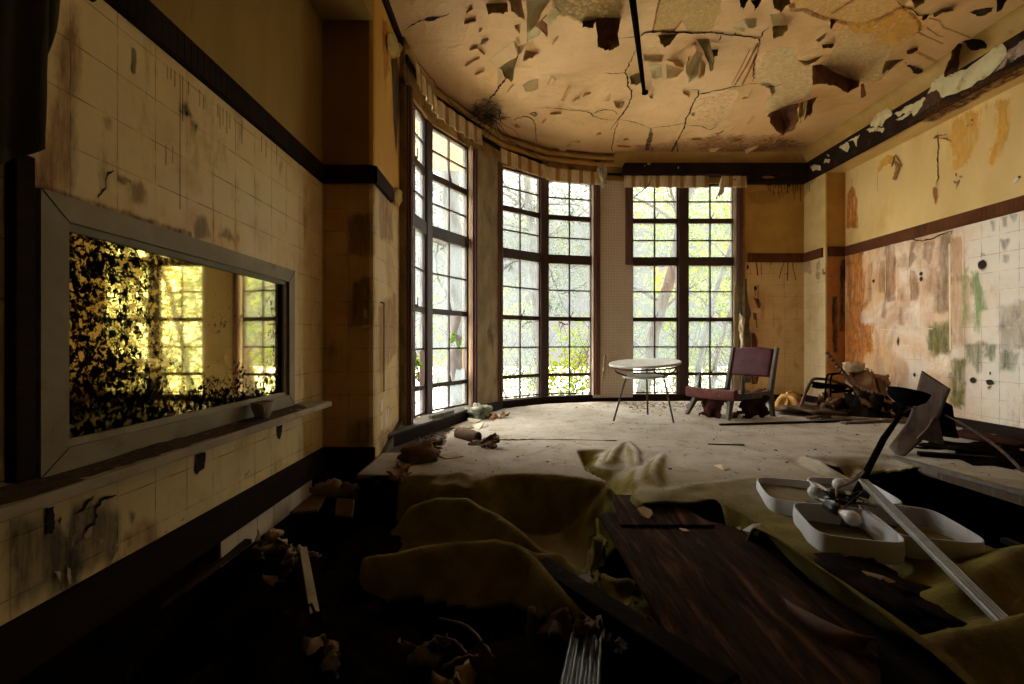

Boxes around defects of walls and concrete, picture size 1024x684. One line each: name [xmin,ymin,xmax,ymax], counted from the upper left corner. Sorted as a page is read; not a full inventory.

flaking render [387,31,403,58]
peeling [464,0,626,92]
crack [534,29,767,152]
flaking render [629,0,721,116]
flaking render [733,0,953,144]
peeling [839,39,1007,152]
damp [949,98,1010,170]
crack [98,170,114,198]
damp [35,182,209,239]
damp [866,226,1024,372]
spalling [195,452,206,475]
spalling [46,506,55,534]